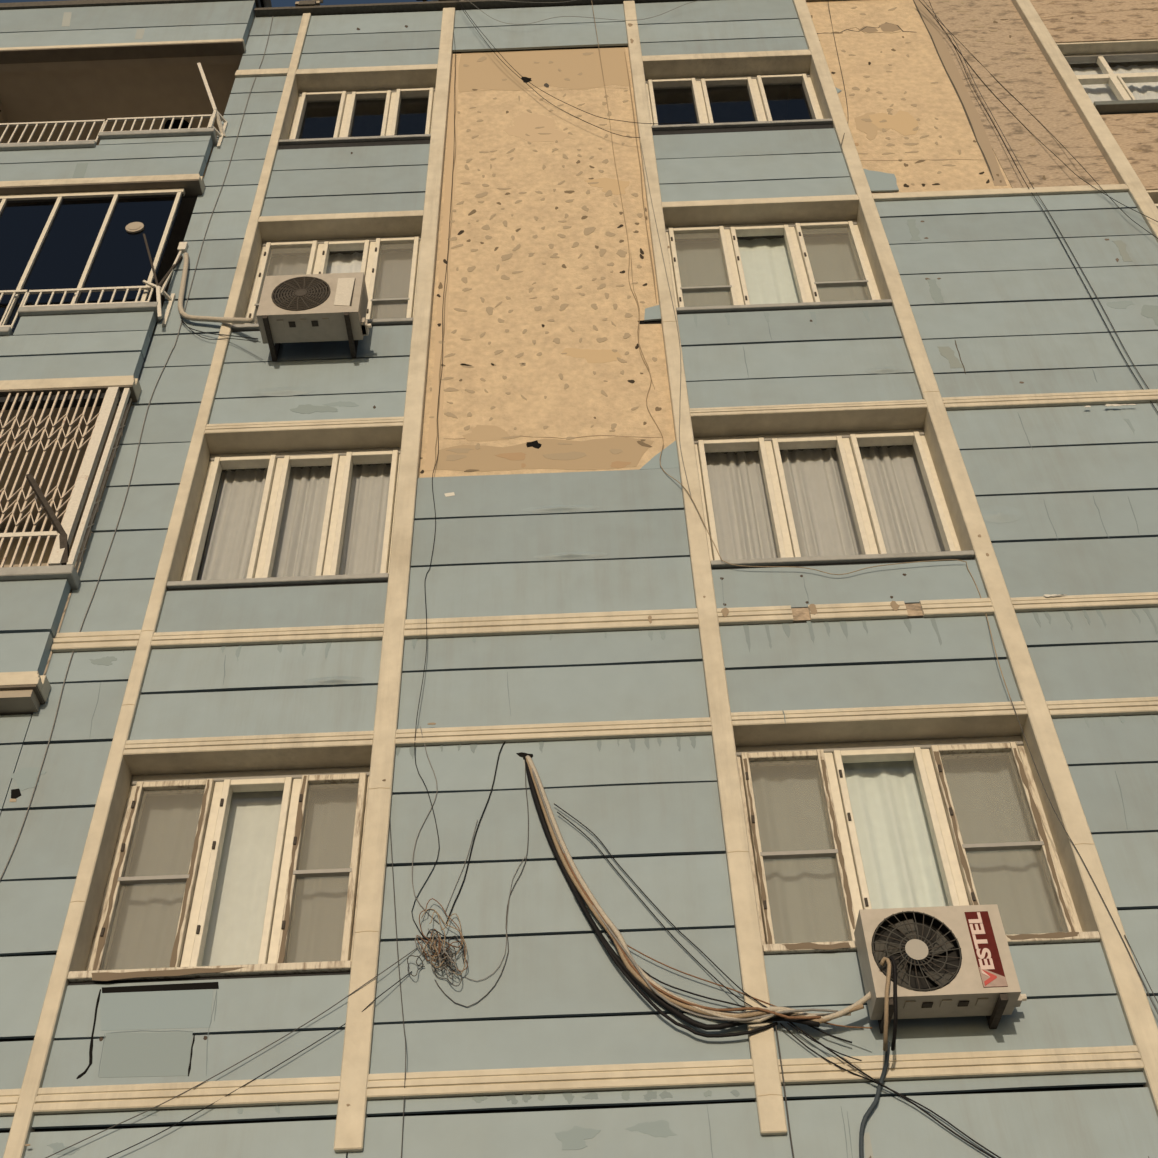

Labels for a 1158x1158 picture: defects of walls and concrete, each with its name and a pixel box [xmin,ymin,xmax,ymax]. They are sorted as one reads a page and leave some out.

spalling [852,7,911,72]
peeling [835,76,961,192]
peeling [913,0,1007,186]
spalling [420,57,679,472]